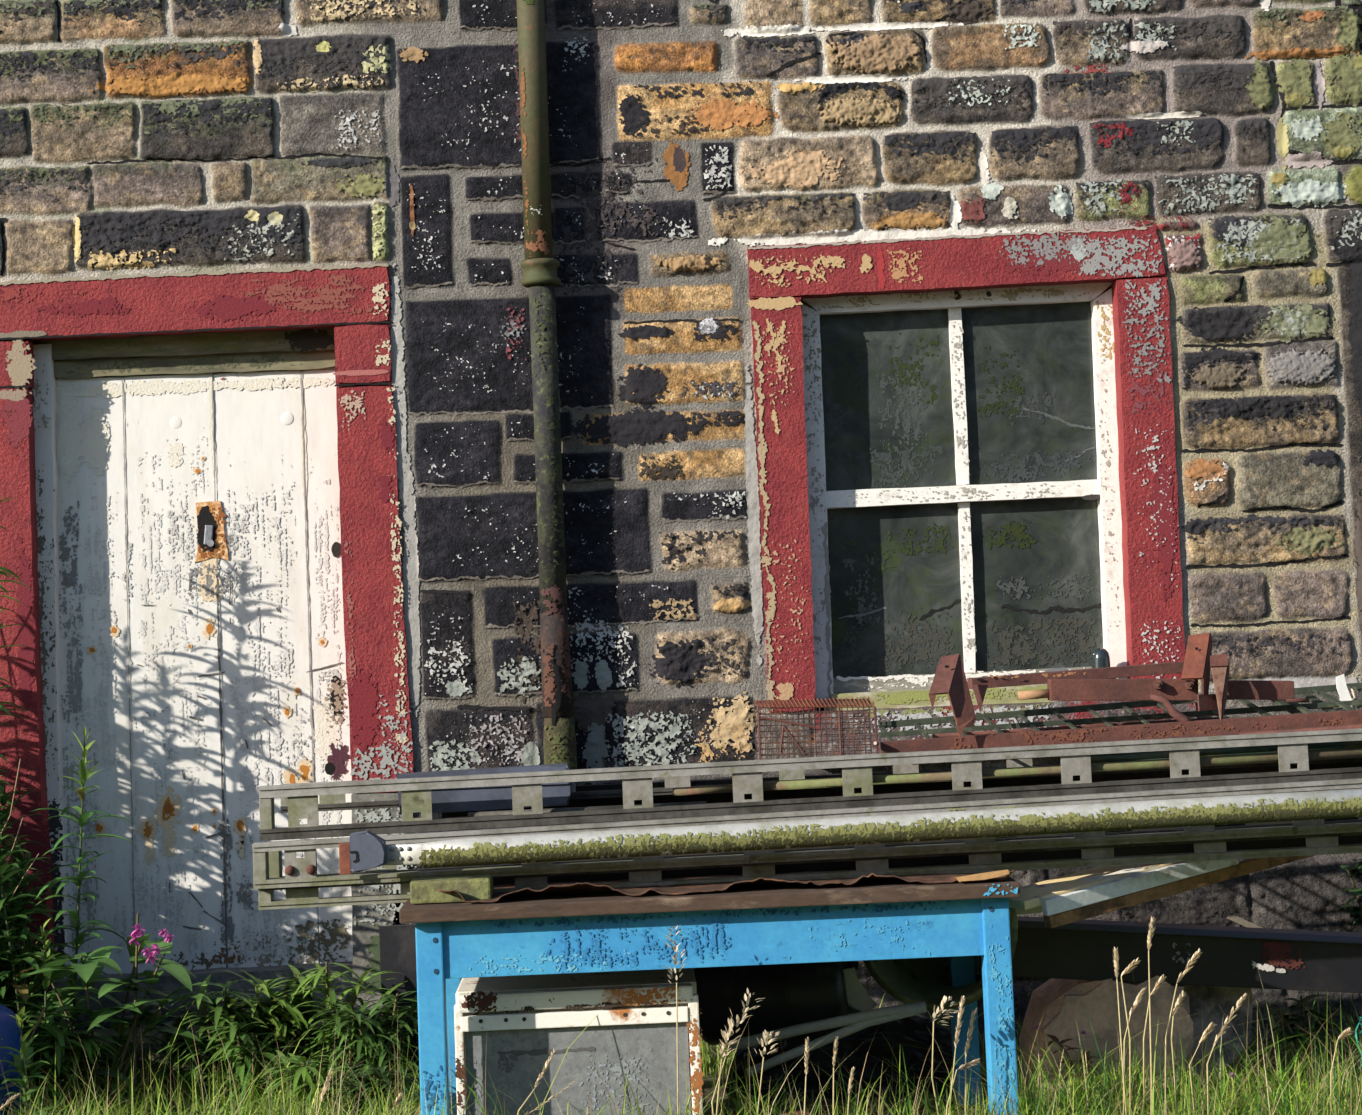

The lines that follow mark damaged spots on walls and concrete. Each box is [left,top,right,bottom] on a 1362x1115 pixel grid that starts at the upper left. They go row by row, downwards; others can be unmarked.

peeling [0,339,51,456]
peeling [695,212,1181,763]
peeling [333,338,409,759]
corrosion [541,585,565,615]
peeling [649,598,699,621]
peeling [16,427,356,979]
corrosion [542,643,556,707]
corrosion [136,786,217,866]
corrosion [233,814,247,859]